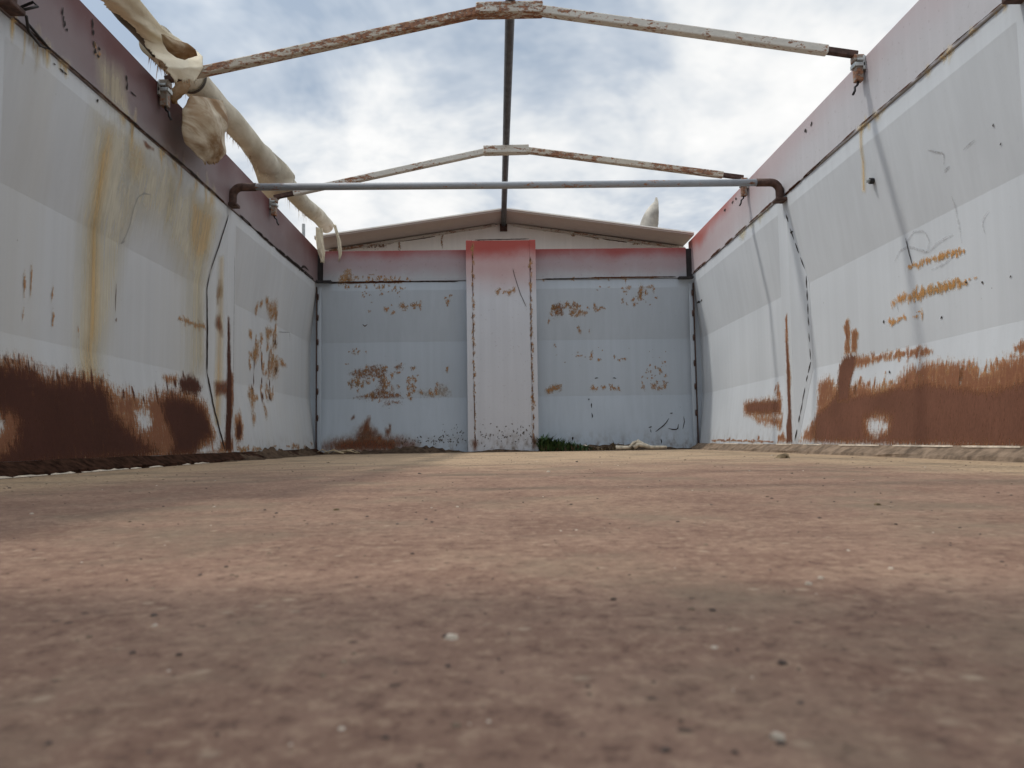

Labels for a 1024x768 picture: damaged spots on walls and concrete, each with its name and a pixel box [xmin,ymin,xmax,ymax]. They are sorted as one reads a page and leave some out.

rust [908,247,965,270]
rust [547,301,605,334]
rust [888,276,977,326]
rust [0,297,285,462]
rust [345,348,438,409]
rust [713,315,1024,446]
rust [325,416,414,450]